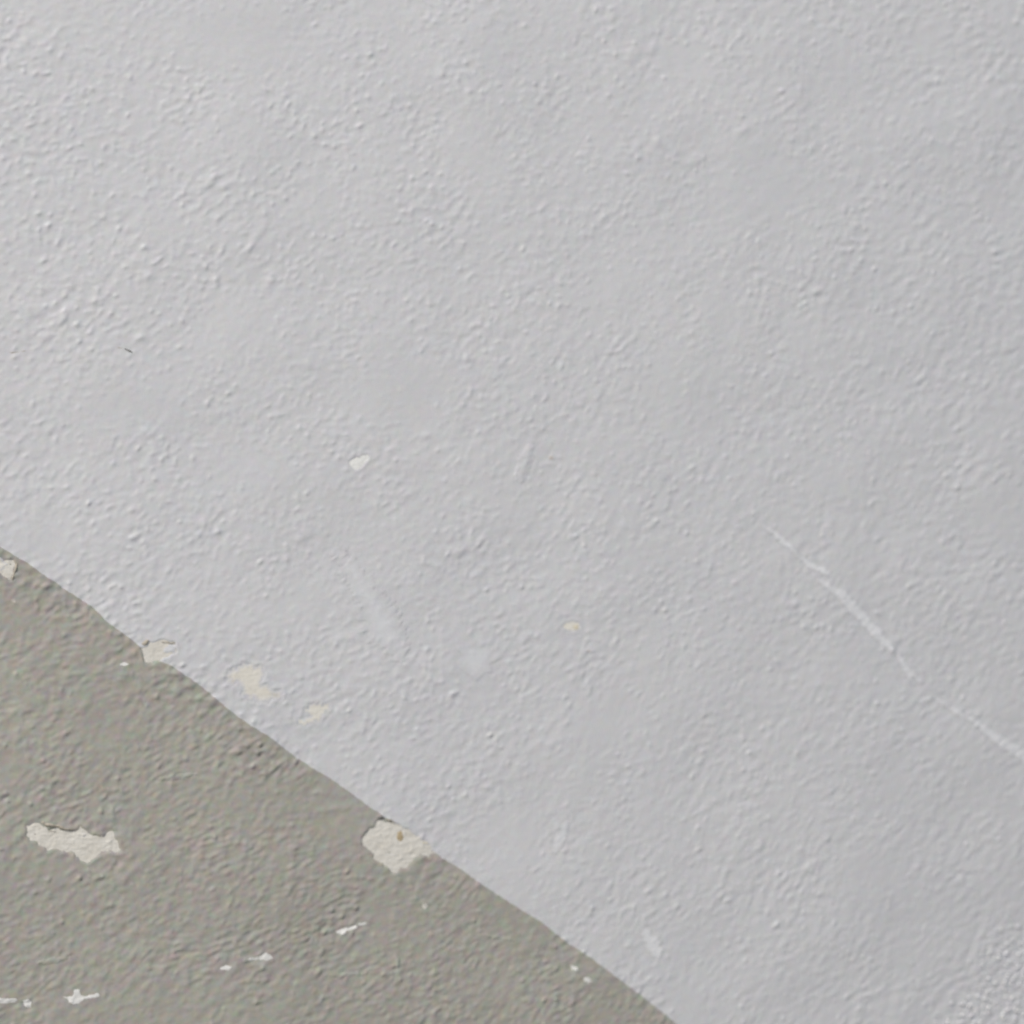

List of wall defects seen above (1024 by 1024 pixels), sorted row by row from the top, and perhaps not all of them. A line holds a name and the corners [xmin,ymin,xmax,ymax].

peeling [0,557,18,580]
peeling [141,639,177,663]
peeling [26,821,120,863]
peeling [362,816,436,873]
peeling [63,989,99,1004]